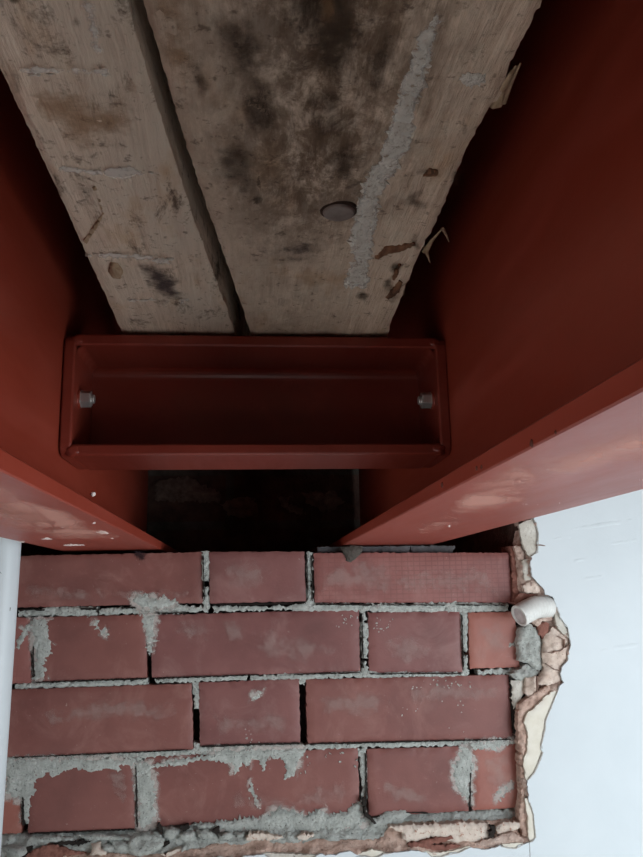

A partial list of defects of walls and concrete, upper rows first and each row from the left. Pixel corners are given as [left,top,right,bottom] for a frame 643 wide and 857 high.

damp [343,15,441,290]
spalling [22,518,570,857]